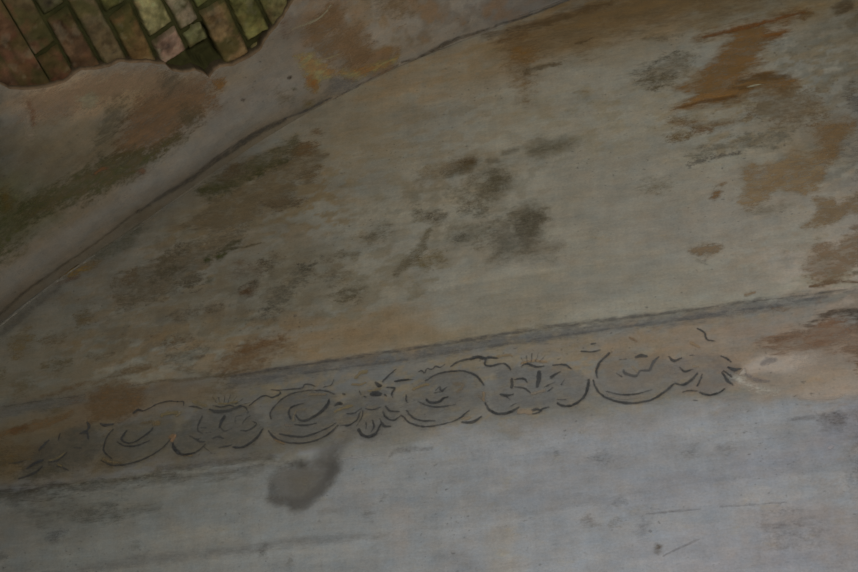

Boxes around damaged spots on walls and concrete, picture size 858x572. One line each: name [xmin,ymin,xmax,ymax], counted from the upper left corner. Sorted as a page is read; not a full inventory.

flaking render [0,0,293,90]